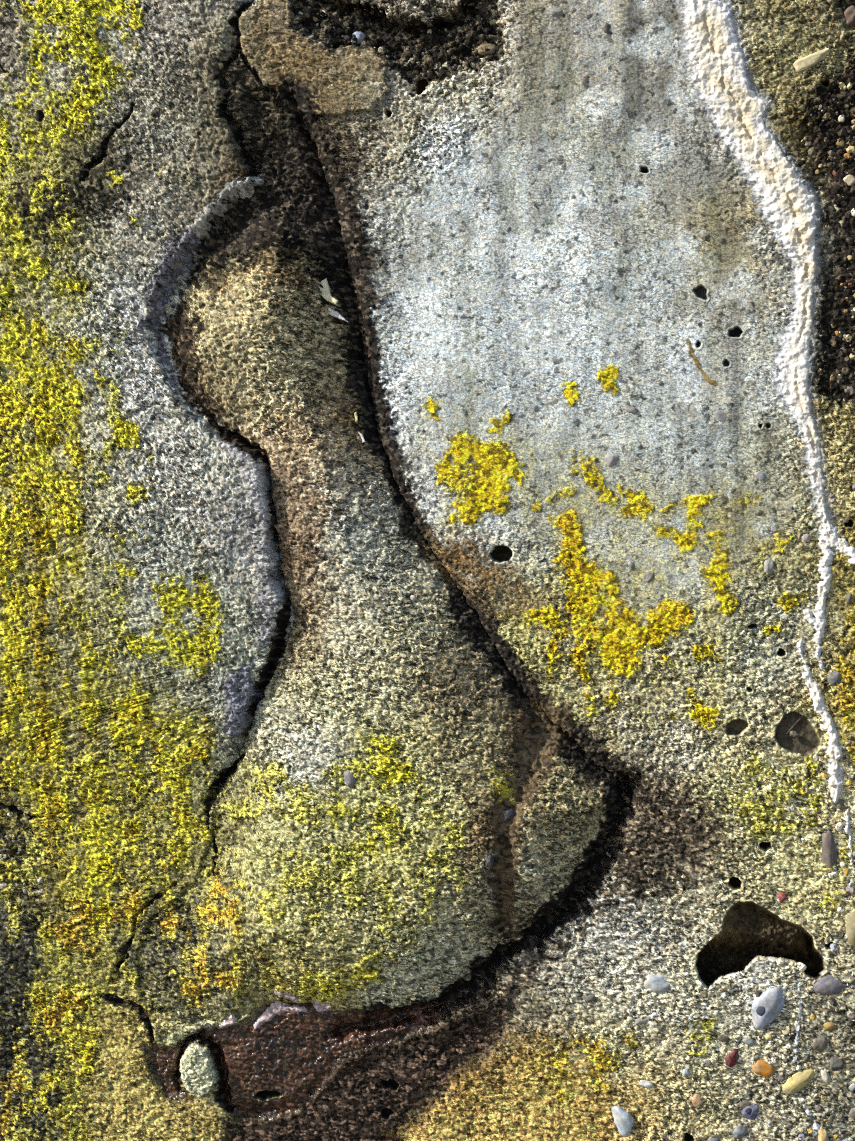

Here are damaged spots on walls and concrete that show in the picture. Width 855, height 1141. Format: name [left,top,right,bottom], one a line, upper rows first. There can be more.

crack [83,103,135,179]
crack [213,426,291,714]
crack [0,803,36,821]
crack [204,754,245,877]
crack [0,865,32,886]
spalling [693,899,829,991]
crack [98,882,234,1113]